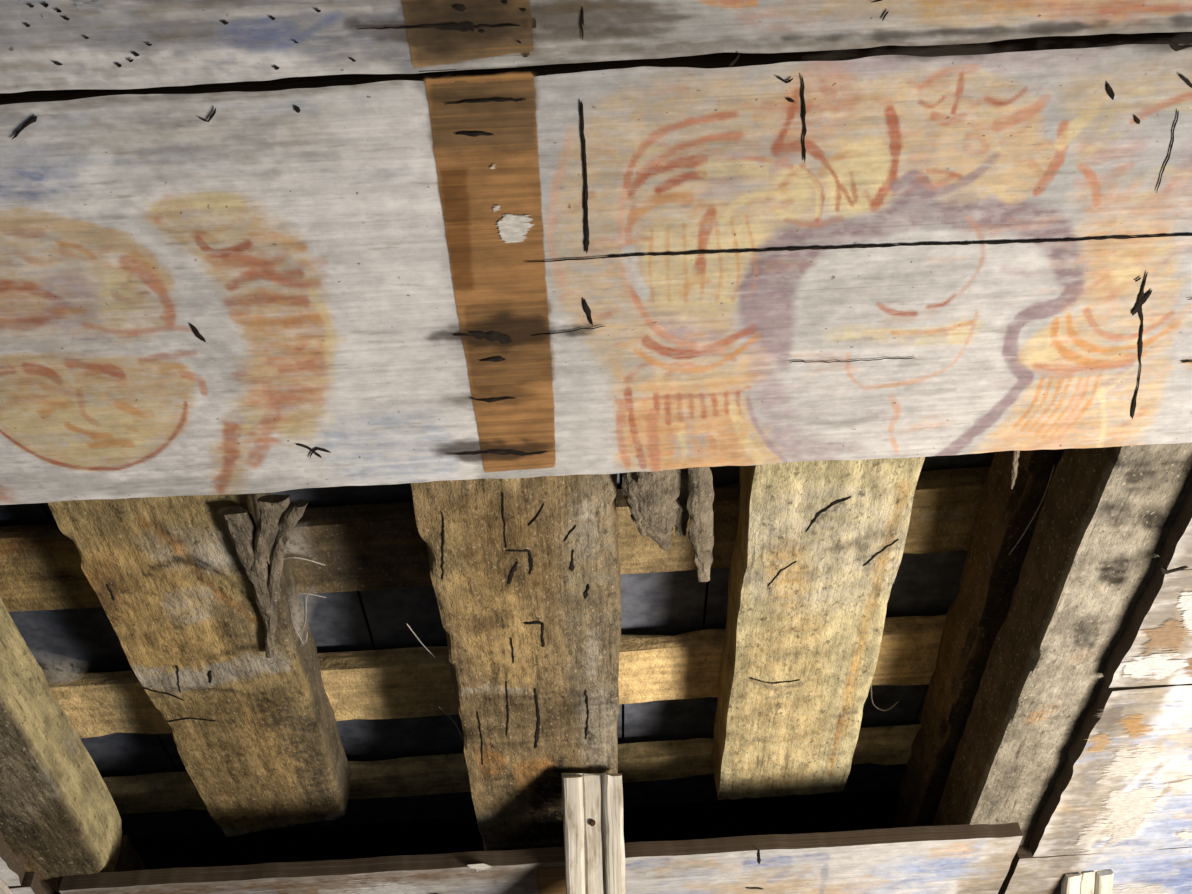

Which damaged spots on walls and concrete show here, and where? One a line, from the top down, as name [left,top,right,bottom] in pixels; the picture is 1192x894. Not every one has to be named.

crack [11,116,37,140]
crack [1106,83,1140,124]
crack [1156,41,1192,193]
crack [526,101,1192,262]
peeling [443,171,472,287]
peeling [493,205,534,243]
peeling [467,302,553,388]
crack [452,299,604,362]
crack [789,356,913,364]
crack [1131,272,1153,419]
crack [470,396,515,404]
crack [1160,566,1188,574]